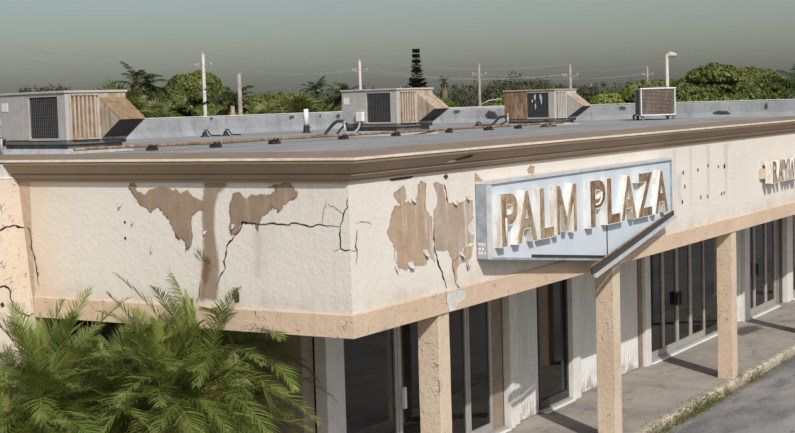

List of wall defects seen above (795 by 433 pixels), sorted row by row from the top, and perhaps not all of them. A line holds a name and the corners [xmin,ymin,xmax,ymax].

crack [0,225,39,280]
peeling [128,183,205,253]
peeling [229,183,298,236]
crack [196,199,369,303]
peeling [387,174,475,311]
crack [433,231,469,288]